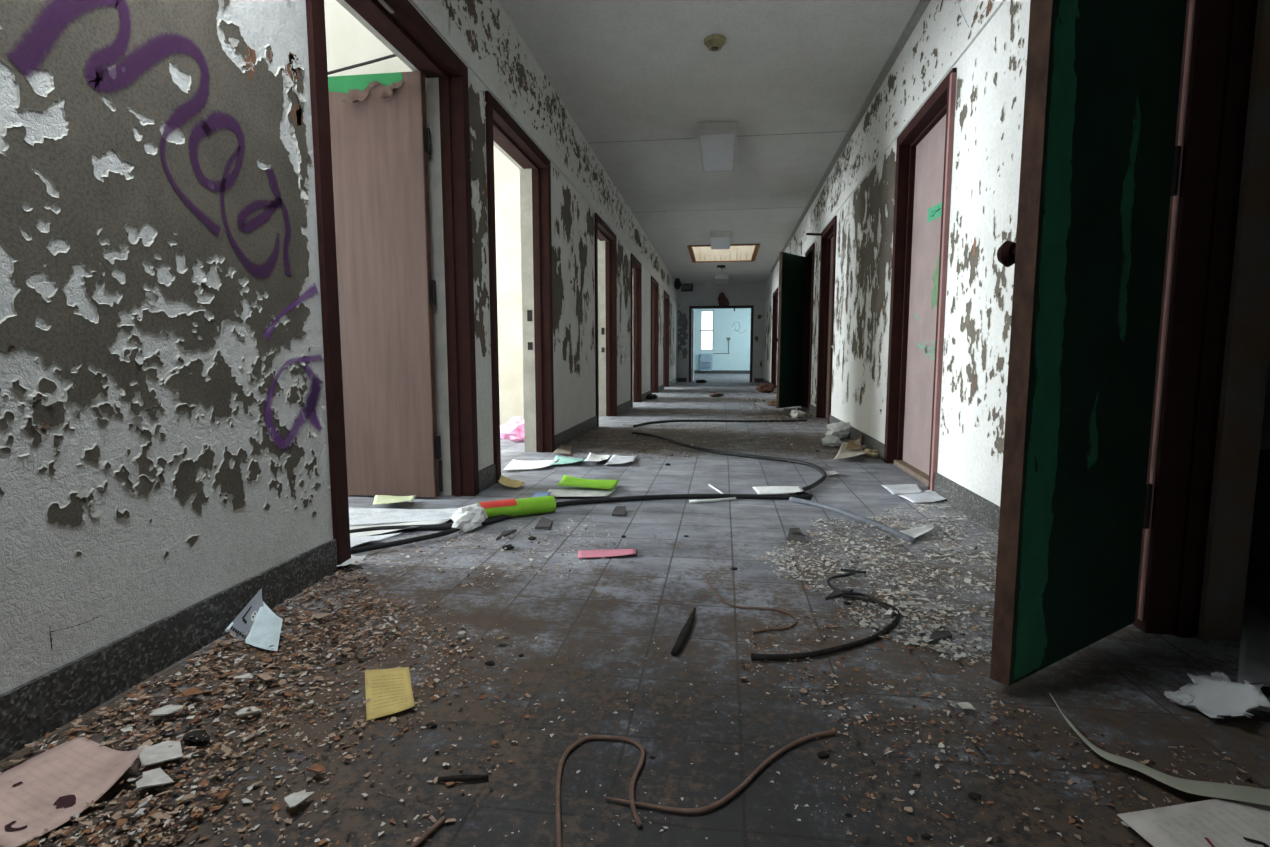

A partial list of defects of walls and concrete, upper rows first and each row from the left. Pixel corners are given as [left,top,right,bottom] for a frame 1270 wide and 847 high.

peeling [0,0,330,528]
peeling [442,0,688,377]
peeling [788,0,994,414]
peeling [941,0,1027,462]
peeling [185,534,199,548]